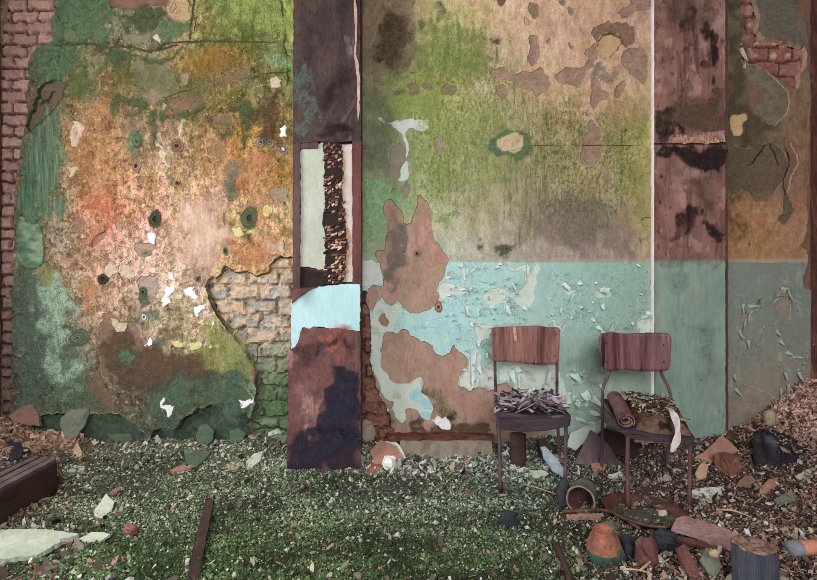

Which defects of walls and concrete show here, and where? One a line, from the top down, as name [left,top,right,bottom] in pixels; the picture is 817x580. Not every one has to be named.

peeling [489,0,651,109]
spalling [0,0,64,417]
crack [748,144,790,248]
spalling [728,0,812,355]
spalling [32,413,65,434]
spalling [65,311,147,379]
spalling [79,255,293,443]
peeling [362,143,606,443]
peeling [546,275,623,333]
peeling [624,285,652,333]
peeling [728,324,808,427]